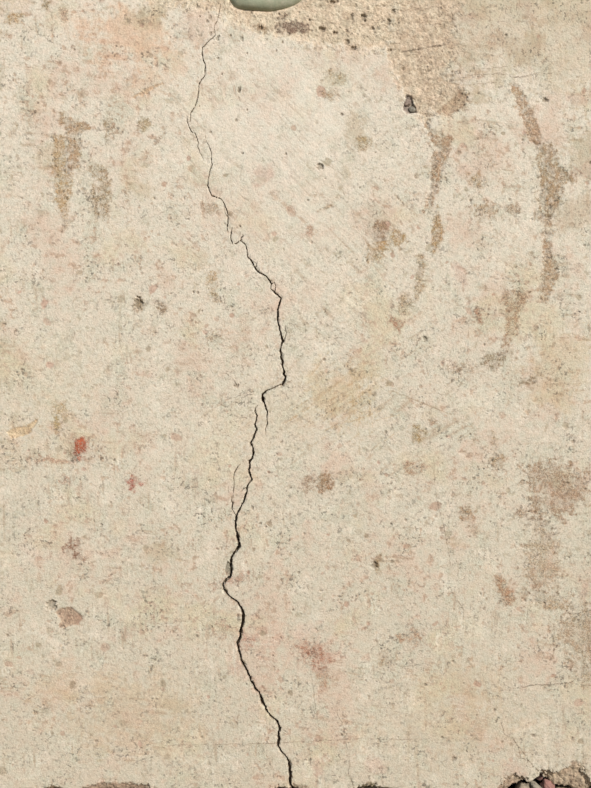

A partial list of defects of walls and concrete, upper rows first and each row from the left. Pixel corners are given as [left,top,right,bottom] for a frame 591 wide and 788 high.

crack [187,4,292,787]
spalling [80,779,152,788]
spalling [497,772,529,788]
spalling [539,760,591,788]